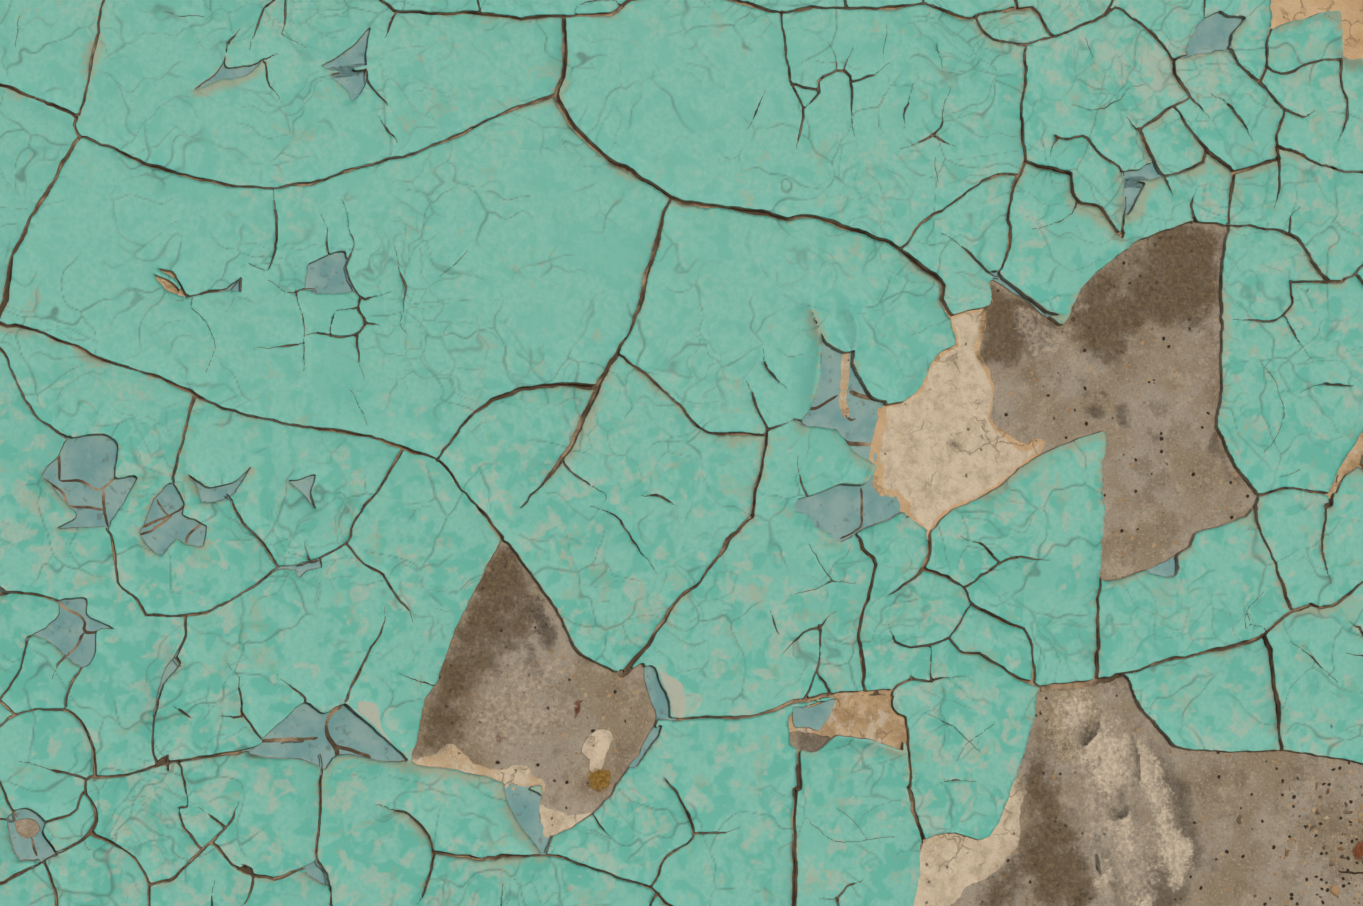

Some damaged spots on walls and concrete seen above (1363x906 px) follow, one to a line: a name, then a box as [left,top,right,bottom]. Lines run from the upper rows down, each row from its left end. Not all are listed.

peeling [1267,0,1363,61]
peeling [43,435,136,529]
crack [0,635,332,906]
peeling [140,479,206,554]
peeling [242,541,686,855]
crack [377,779,740,906]
crack [0,0,1363,702]
crack [792,714,994,906]
crack [676,468,1363,750]
peeling [794,222,1258,580]
peeling [913,676,1363,906]